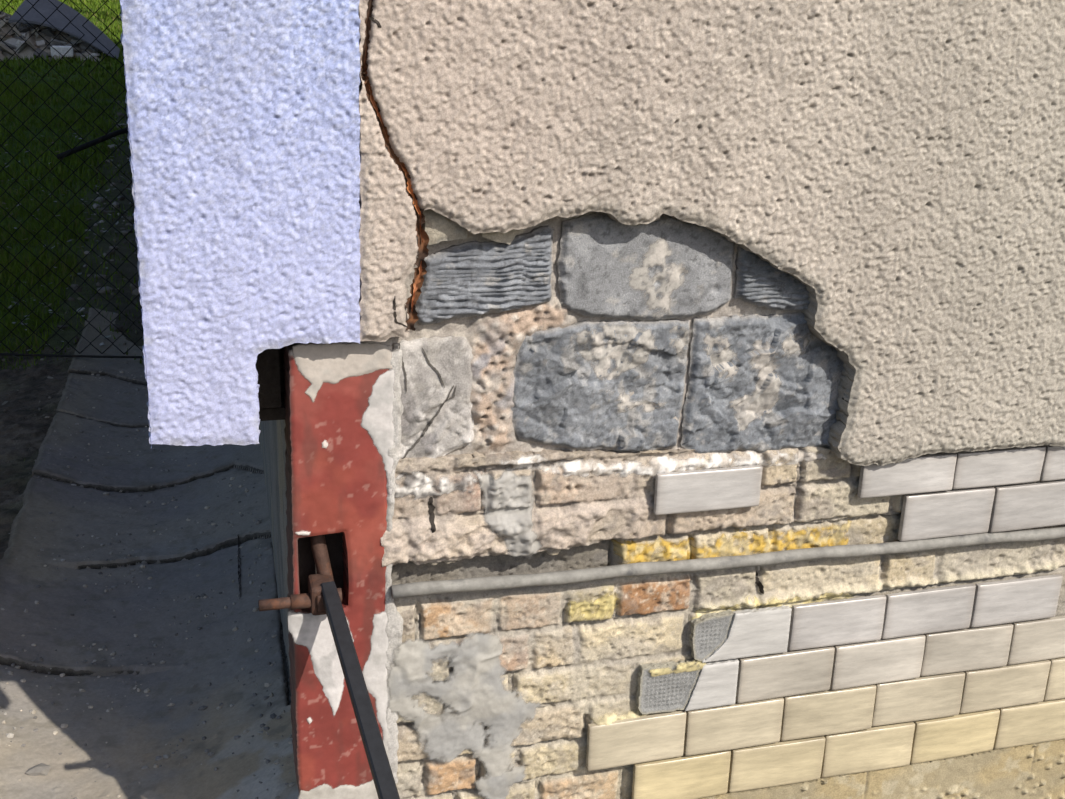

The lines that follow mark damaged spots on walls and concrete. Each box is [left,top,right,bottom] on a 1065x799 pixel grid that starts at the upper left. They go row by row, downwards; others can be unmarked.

rust [364,47,388,140]
crack [359,0,456,459]
rust [401,165,423,243]
crack [69,370,147,386]
crack [54,409,149,428]
crack [34,464,264,493]
spalling [288,209,1065,799]
crack [78,532,271,593]
crack [0,656,140,676]